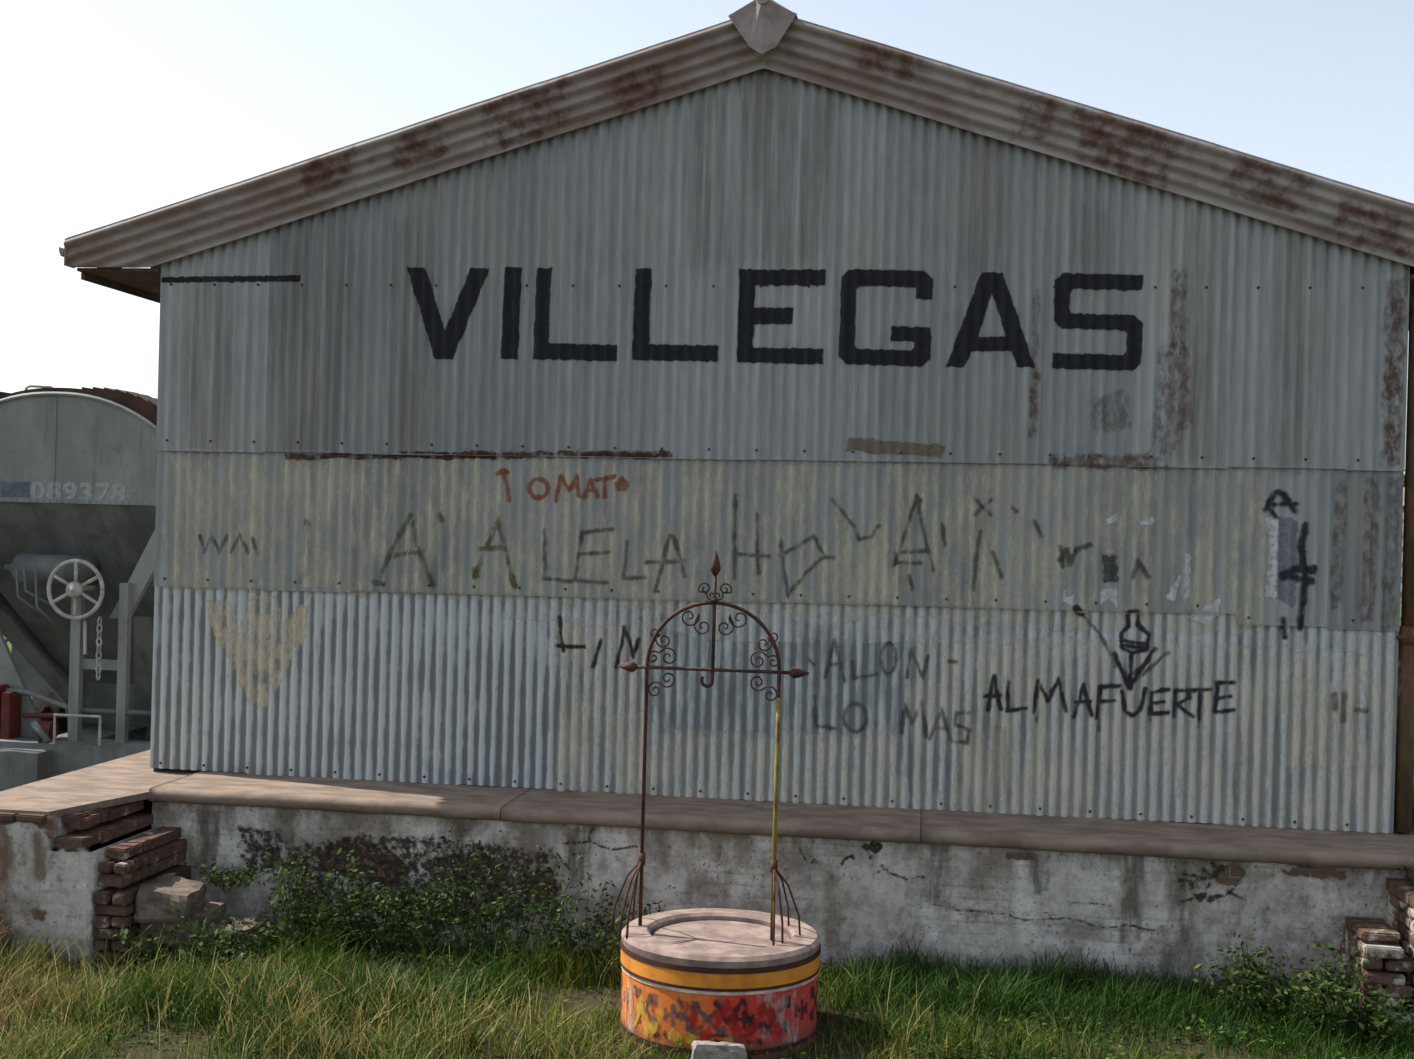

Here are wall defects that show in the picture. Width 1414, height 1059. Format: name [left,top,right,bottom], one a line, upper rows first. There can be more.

corrosion [487,77,564,149]
corrosion [1081,109,1166,183]
corrosion [1231,155,1305,210]
peeling [0,818,91,959]
crack [799,848,1155,931]
crack [1181,873,1247,903]